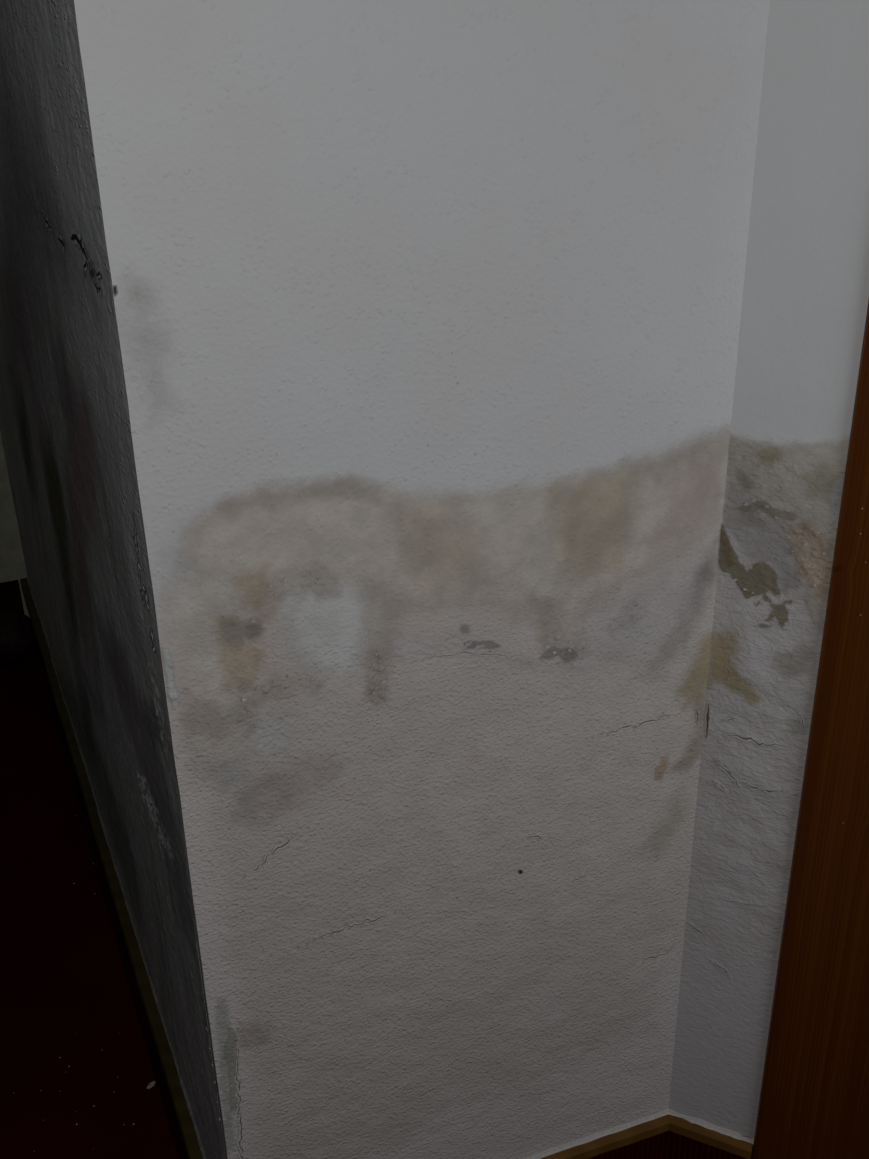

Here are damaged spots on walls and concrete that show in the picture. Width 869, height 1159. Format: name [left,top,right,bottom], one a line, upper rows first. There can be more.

damp [188,432,849,662]
spalling [719,524,792,628]
damp [165,593,297,779]